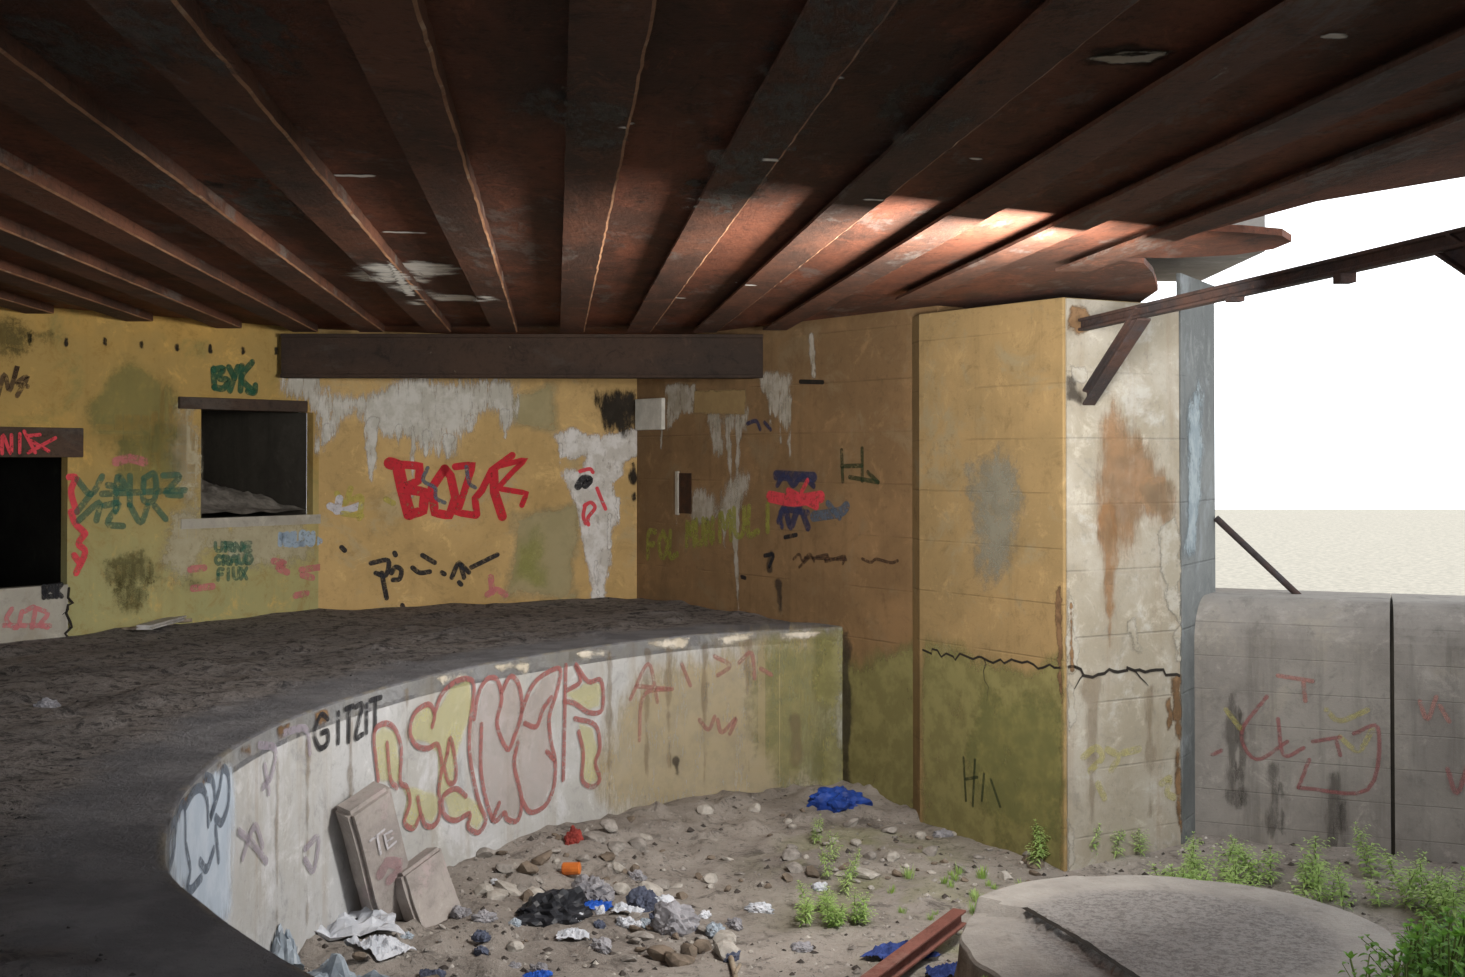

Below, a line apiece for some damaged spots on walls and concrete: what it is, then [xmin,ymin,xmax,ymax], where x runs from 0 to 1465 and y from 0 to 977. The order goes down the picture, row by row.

corrosion [1098,412,1173,617]
crack [922,648,1180,702]